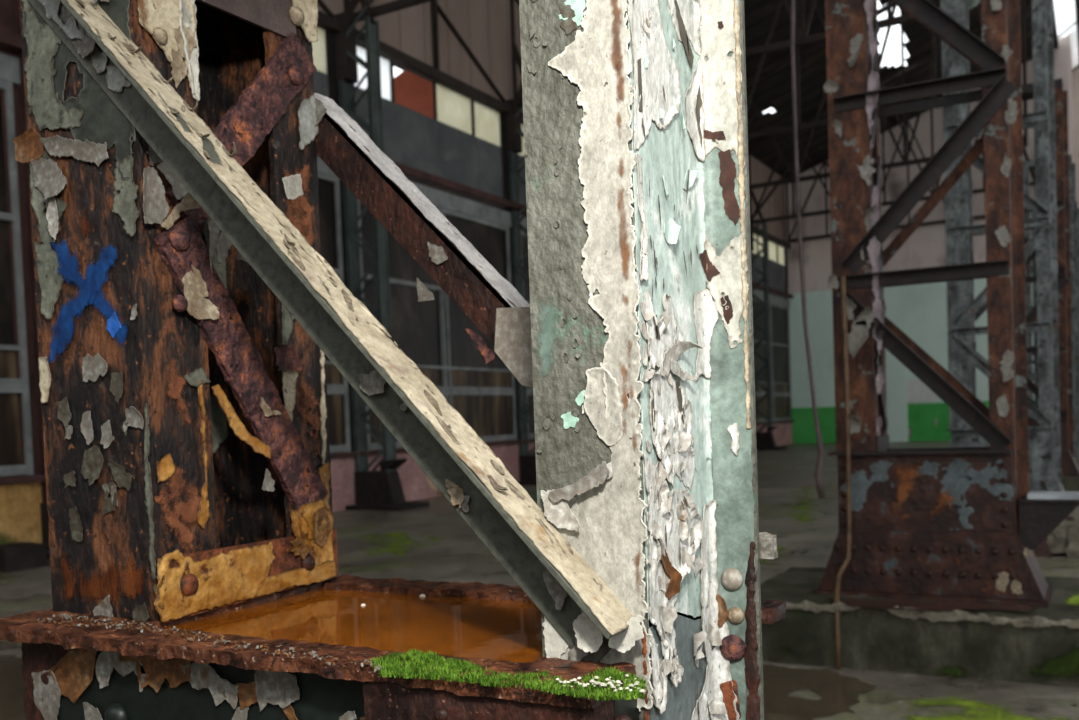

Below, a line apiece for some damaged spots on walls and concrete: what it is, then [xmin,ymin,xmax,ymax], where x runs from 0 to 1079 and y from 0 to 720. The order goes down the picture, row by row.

rust [612,0,624,99]
rust [286,165,315,246]
rust [618,190,629,278]
rust [167,361,191,424]
peeling [13,0,751,720]
rust [621,364,633,409]
rust [155,468,201,549]
peeling [840,460,893,512]
peeling [917,458,1015,531]
rust [60,554,143,601]
rust [824,597,1039,611]
rust [21,643,72,720]